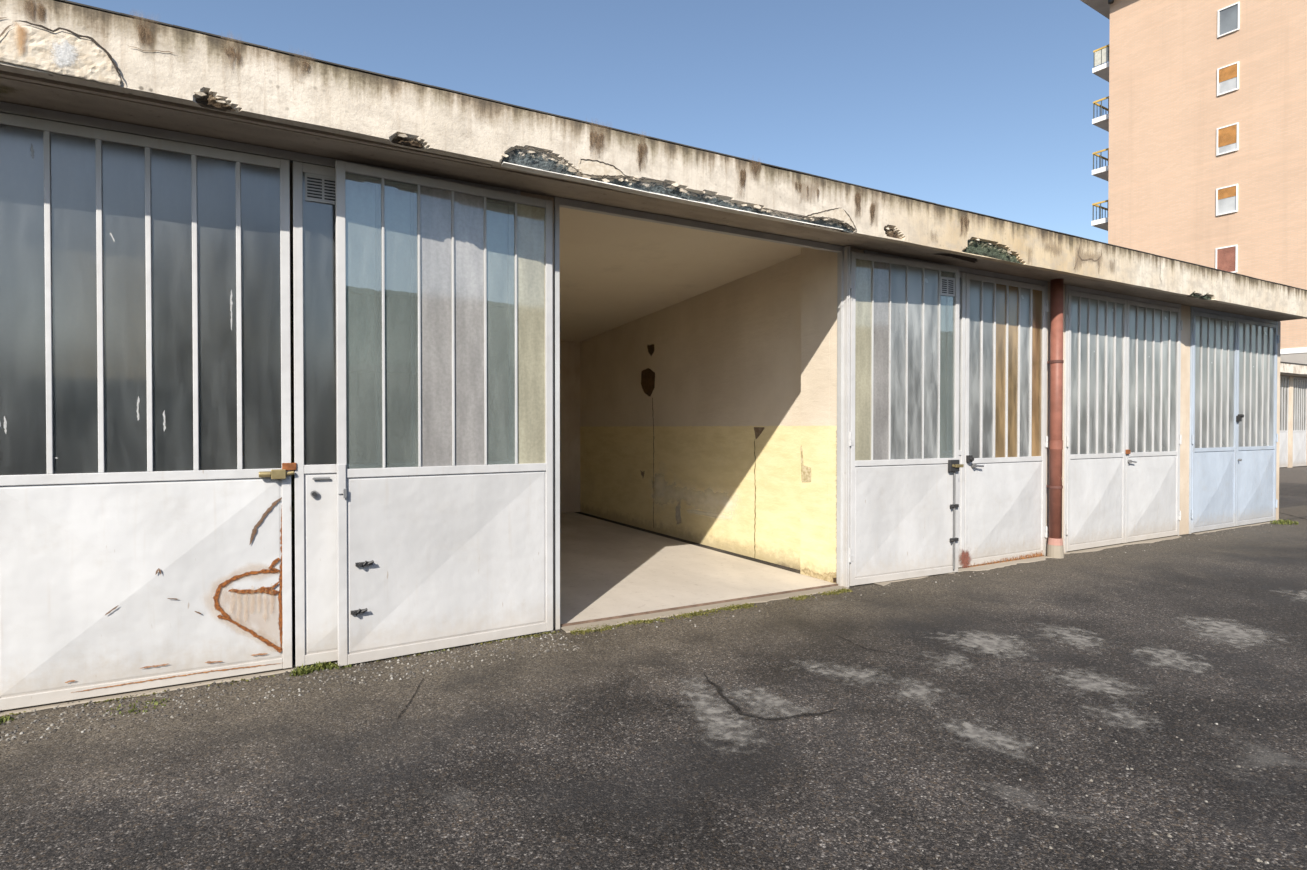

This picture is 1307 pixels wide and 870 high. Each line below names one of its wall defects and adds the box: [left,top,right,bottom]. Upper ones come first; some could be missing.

damp [28,0,44,17]
damp [138,25,152,44]
spalling [194,92,235,111]
damp [590,131,603,148]
damp [740,161,761,186]
spalling [499,146,857,233]
damp [855,193,875,216]
spalling [935,238,1023,264]
rust [65,497,283,693]